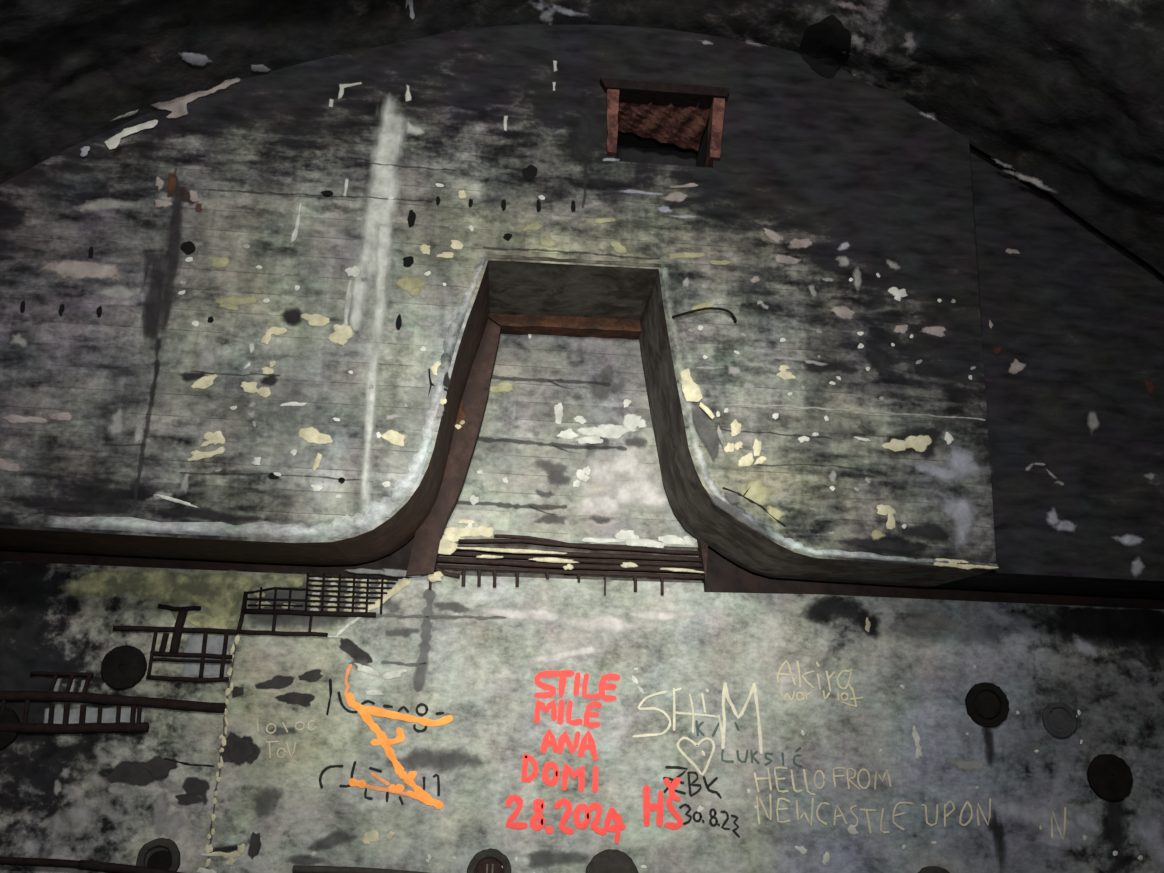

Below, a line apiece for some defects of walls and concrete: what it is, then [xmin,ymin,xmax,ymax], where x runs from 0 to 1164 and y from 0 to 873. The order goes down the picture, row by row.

peeling [180,53,211,66]
peeling [152,78,240,118]
water stain [344,99,423,508]
water stain [143,253,163,404]
flaking render [301,313,368,345]
flaking render [191,350,217,389]
flaking render [241,361,276,418]
flaking render [299,427,333,491]
flaking render [381,414,407,446]
flaking render [854,432,954,452]
flaking render [871,505,907,539]
spalling [438,519,579,570]